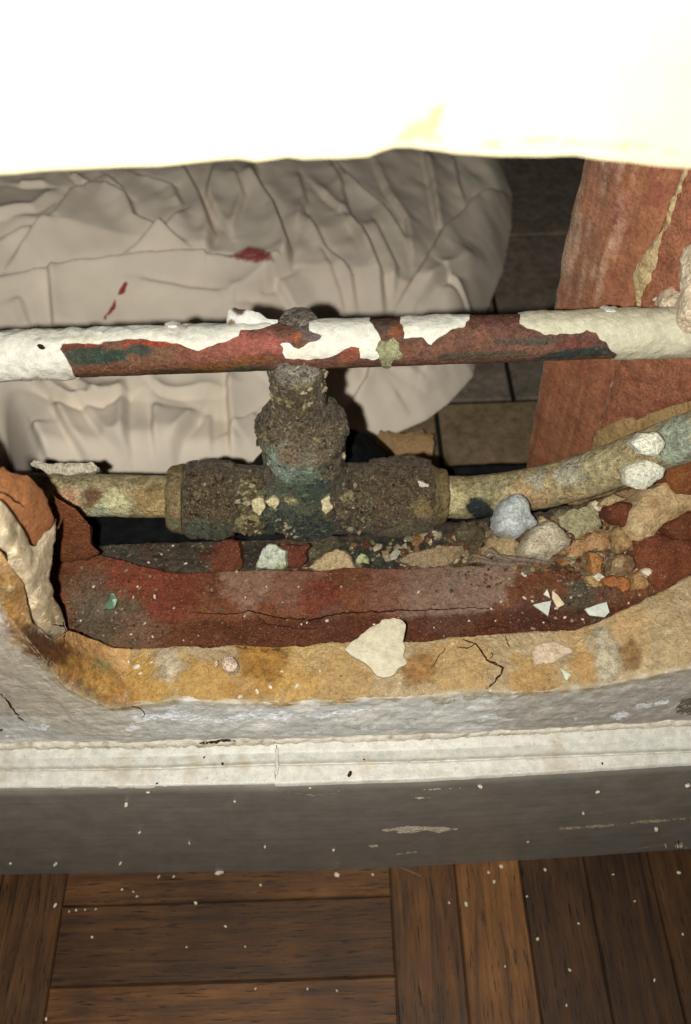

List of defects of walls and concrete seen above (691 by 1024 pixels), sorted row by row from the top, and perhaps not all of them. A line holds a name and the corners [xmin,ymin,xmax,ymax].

peeling [0,320,271,382]
peeling [280,317,381,360]
peeling [400,314,471,345]
peeling [518,305,691,360]
spalling [652,462,691,495]
peeling [252,495,280,516]
peeling [321,493,333,515]
spalling [598,501,633,527]
flaking render [0,511,691,732]
crack [193,607,511,689]